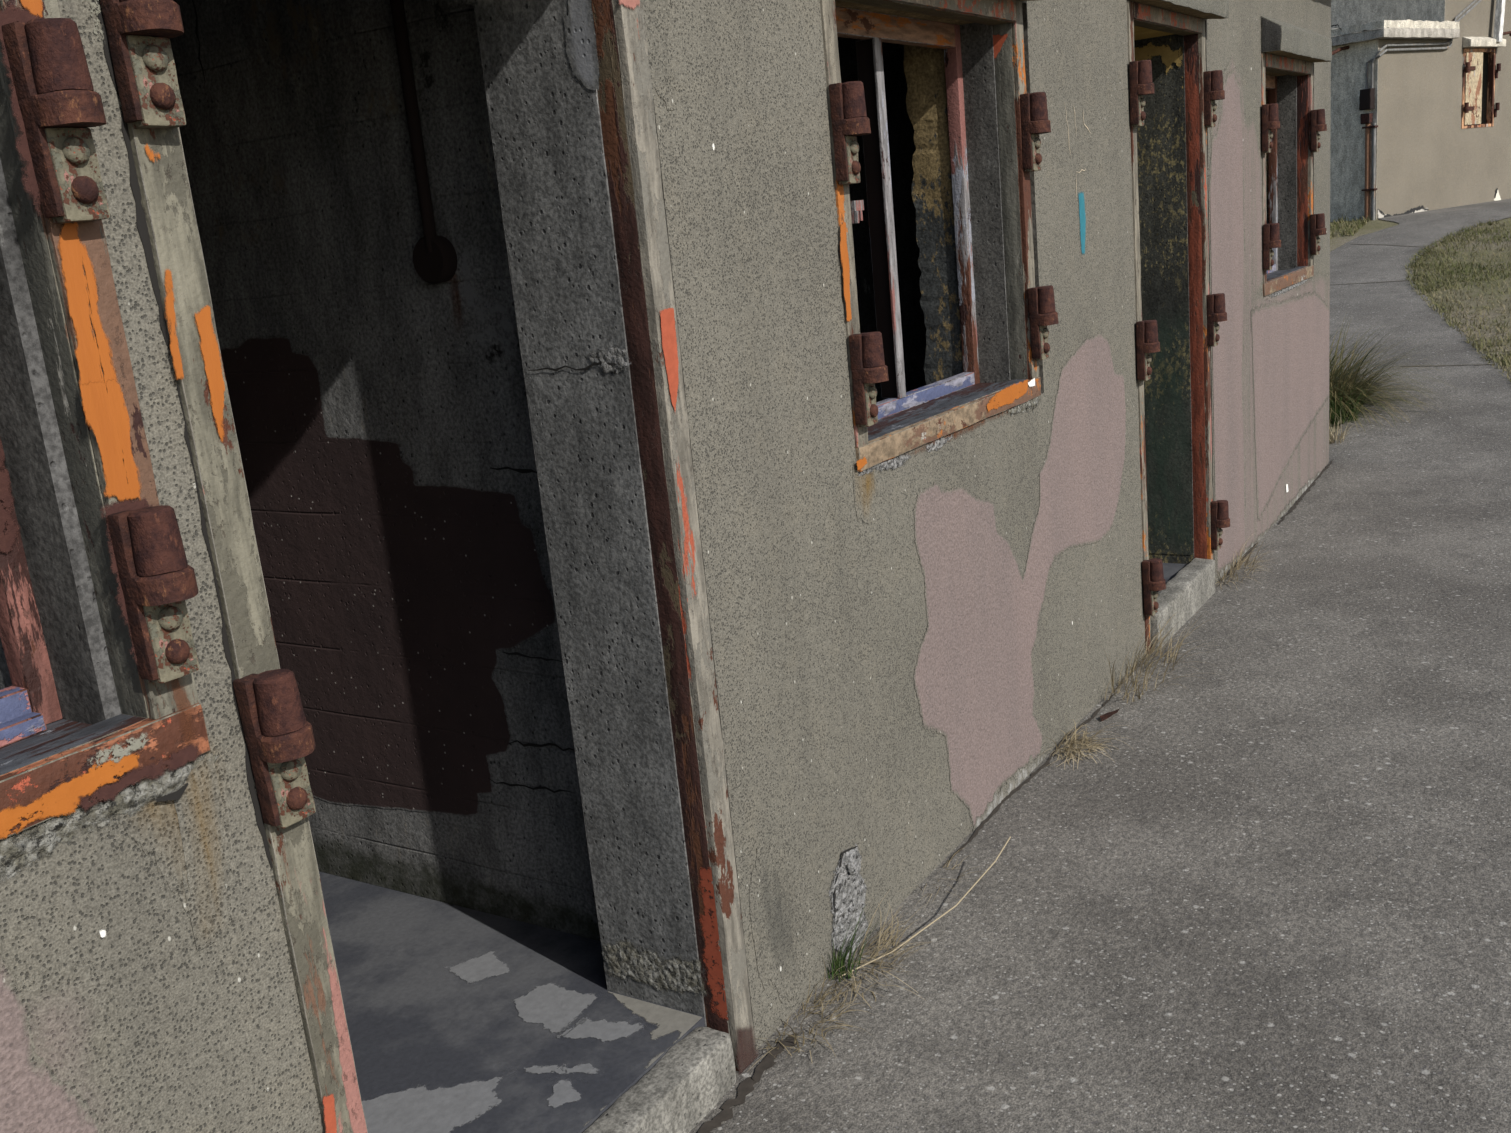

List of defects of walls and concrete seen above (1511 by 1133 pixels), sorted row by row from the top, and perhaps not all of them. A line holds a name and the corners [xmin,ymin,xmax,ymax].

rust [0,3,44,215]
peeling [58,222,141,501]
peeling [165,269,184,379]
peeling [195,305,225,442]
crack [528,362,627,371]
rust [100,498,161,663]
spalling [0,733,217,882]
crack [489,778,573,793]
crack [508,740,575,751]
peeling [514,867,728,1068]
peeling [362,1077,502,1133]
peeling [524,1063,598,1108]